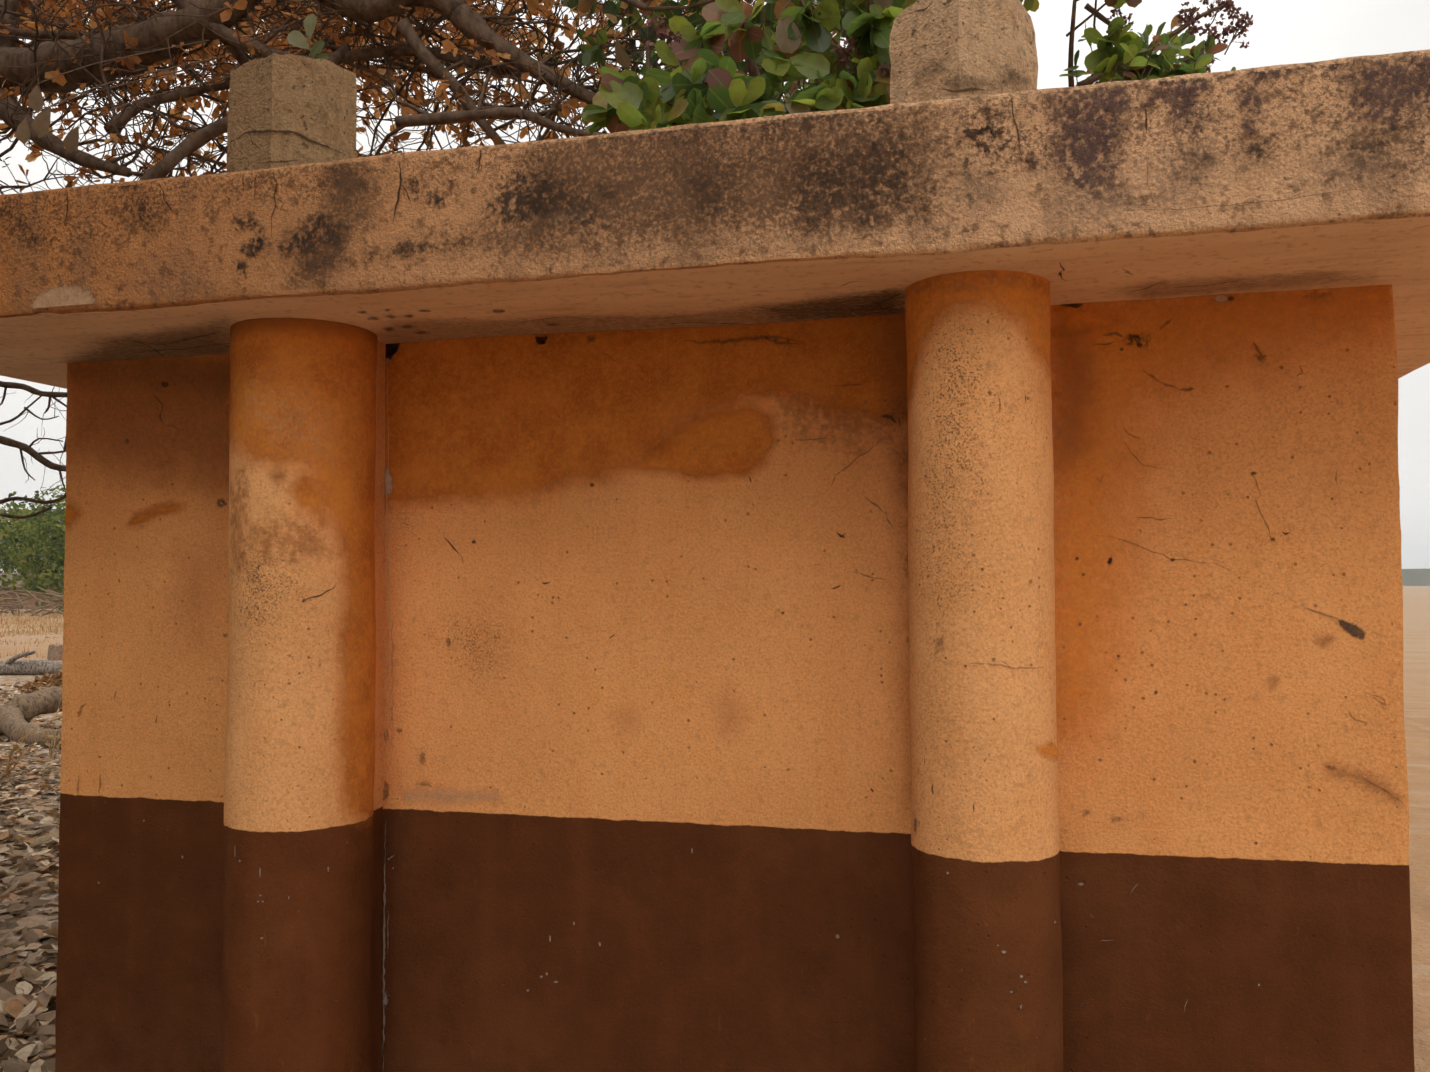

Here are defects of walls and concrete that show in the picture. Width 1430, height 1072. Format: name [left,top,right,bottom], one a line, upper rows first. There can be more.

crack [232,129,341,237]
water stain [233,163,370,289]
water stain [370,106,936,258]
water stain [950,106,1038,174]
water stain [1049,84,1139,198]
water stain [1154,67,1303,158]
water stain [1321,55,1430,167]
water stain [70,270,1392,816]